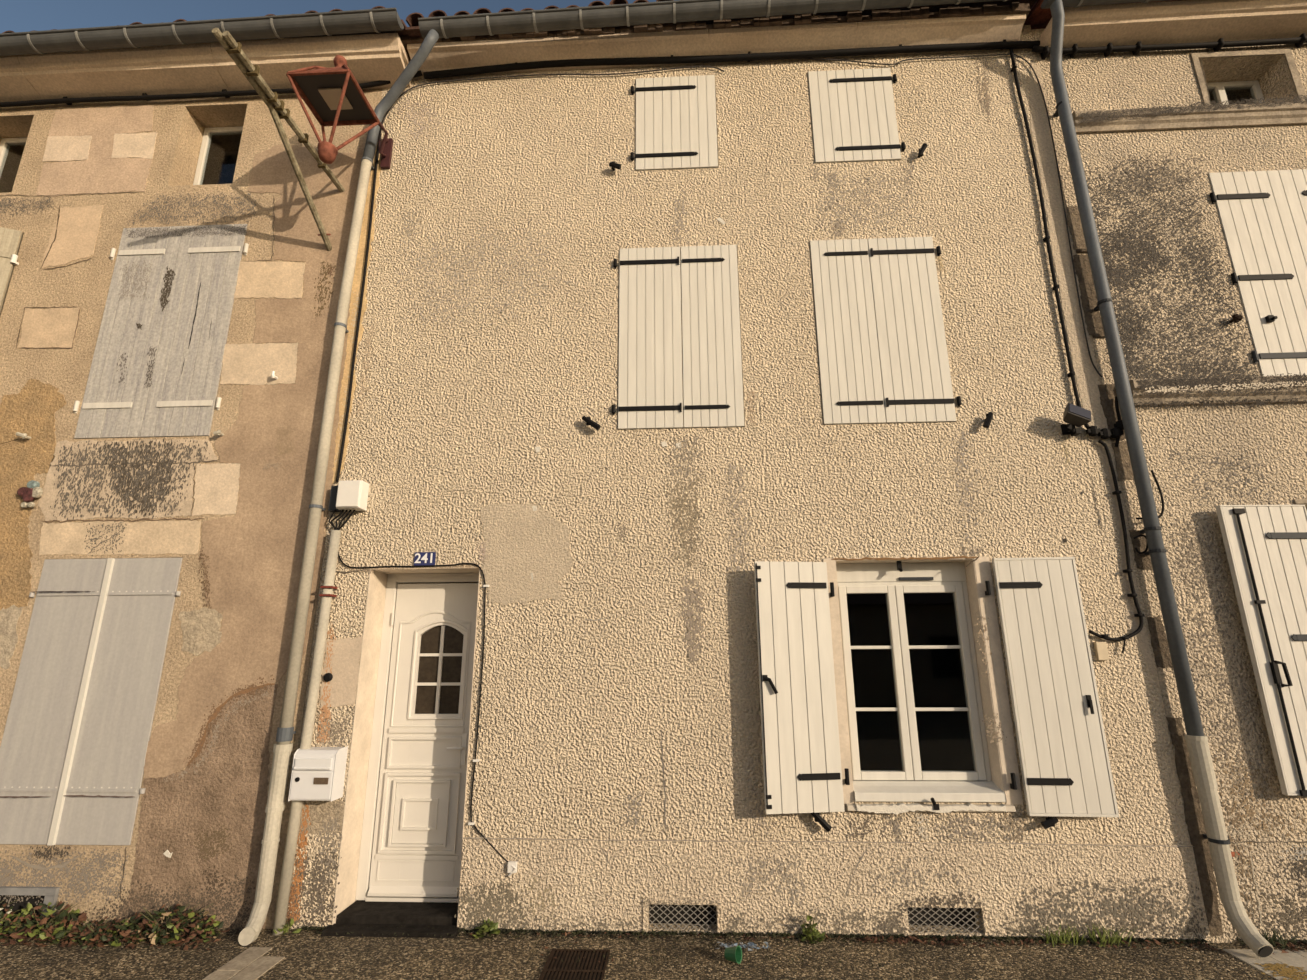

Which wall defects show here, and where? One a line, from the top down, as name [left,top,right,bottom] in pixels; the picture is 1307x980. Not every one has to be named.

leakage [1072,147,1307,409]
leakage [50,438,210,556]